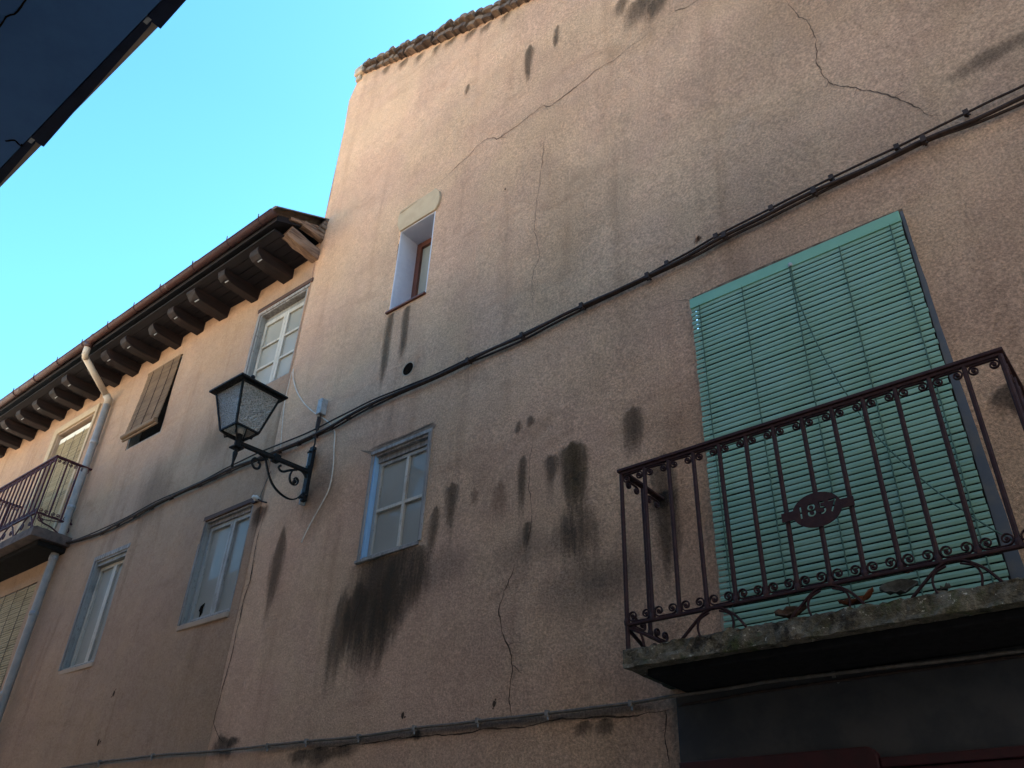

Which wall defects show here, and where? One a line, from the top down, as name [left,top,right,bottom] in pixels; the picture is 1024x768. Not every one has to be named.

crack [788,4,942,116]
damp [382,306,409,374]
damp [625,407,641,442]
damp [328,483,456,663]
crack [336,438,670,768]